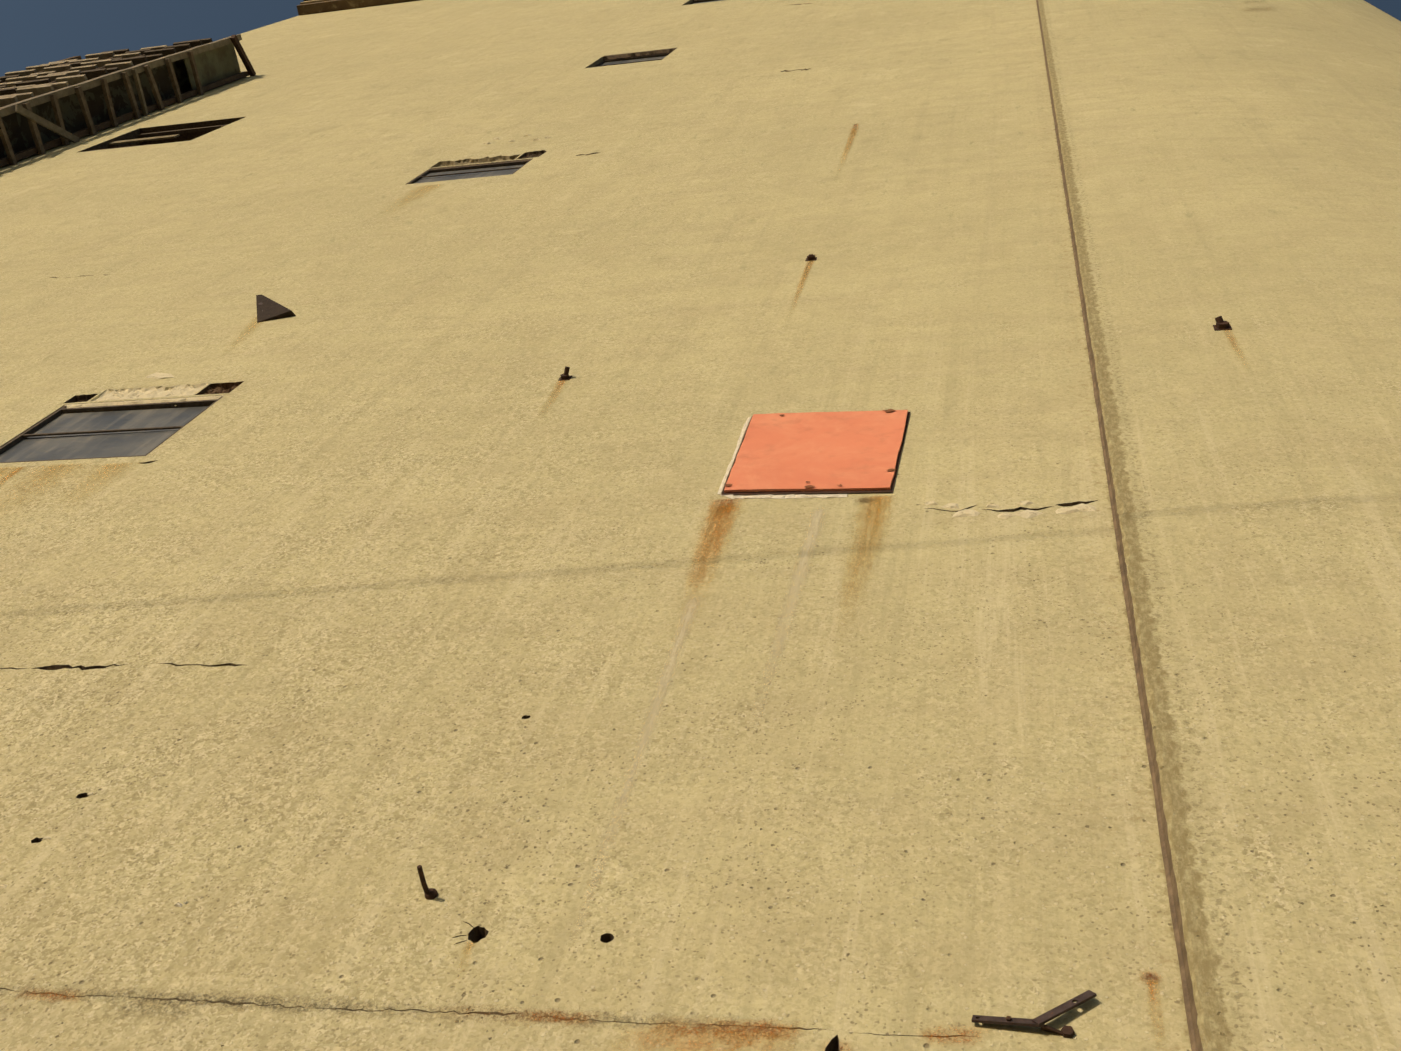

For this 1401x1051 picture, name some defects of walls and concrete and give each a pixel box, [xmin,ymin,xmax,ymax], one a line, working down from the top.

crack [924,500,1098,519]
crack [0,663,124,671]
crack [157,661,243,669]
crack [0,988,833,1031]
crack [869,1031,978,1039]